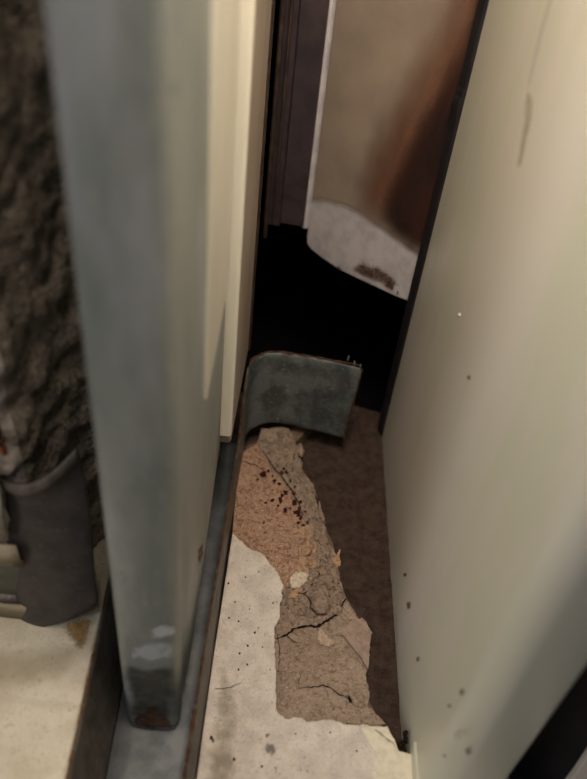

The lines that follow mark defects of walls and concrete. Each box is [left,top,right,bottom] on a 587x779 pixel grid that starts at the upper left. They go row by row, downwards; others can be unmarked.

rust [0,426,9,456]
crack [276,598,346,643]
flaking render [233,427,412,779]
crack [298,671,352,703]